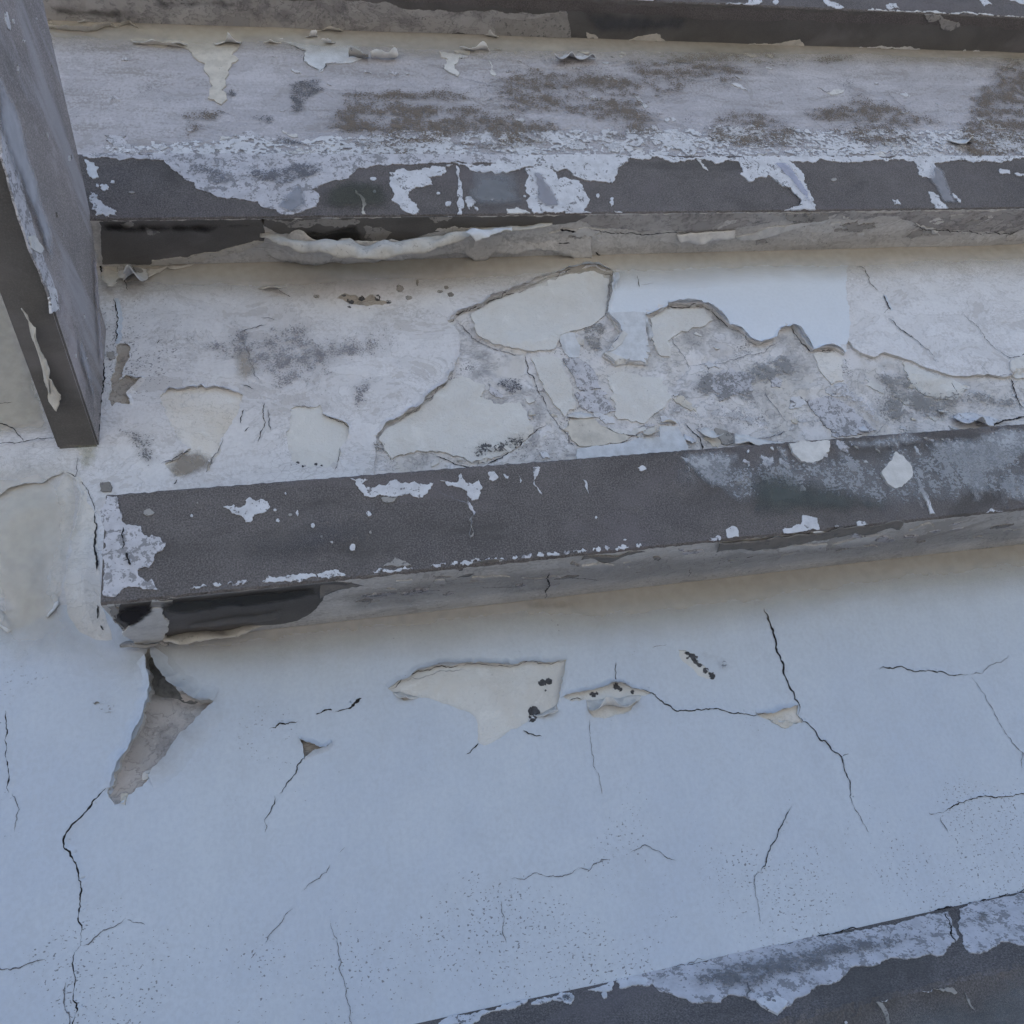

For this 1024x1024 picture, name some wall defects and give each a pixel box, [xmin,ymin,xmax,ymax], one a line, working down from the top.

water stain [53,17,1024,157]
peeling [0,87,64,314]
peeling [21,308,61,412]
peeling [68,117,1024,563]
crack [265,759,302,830]
spalling [98,482,661,805]
crack [646,686,768,716]
crack [764,608,868,831]
crack [876,660,1024,831]
crack [62,786,145,1024]
peeling [438,992,574,1024]
peeling [588,893,1024,1016]